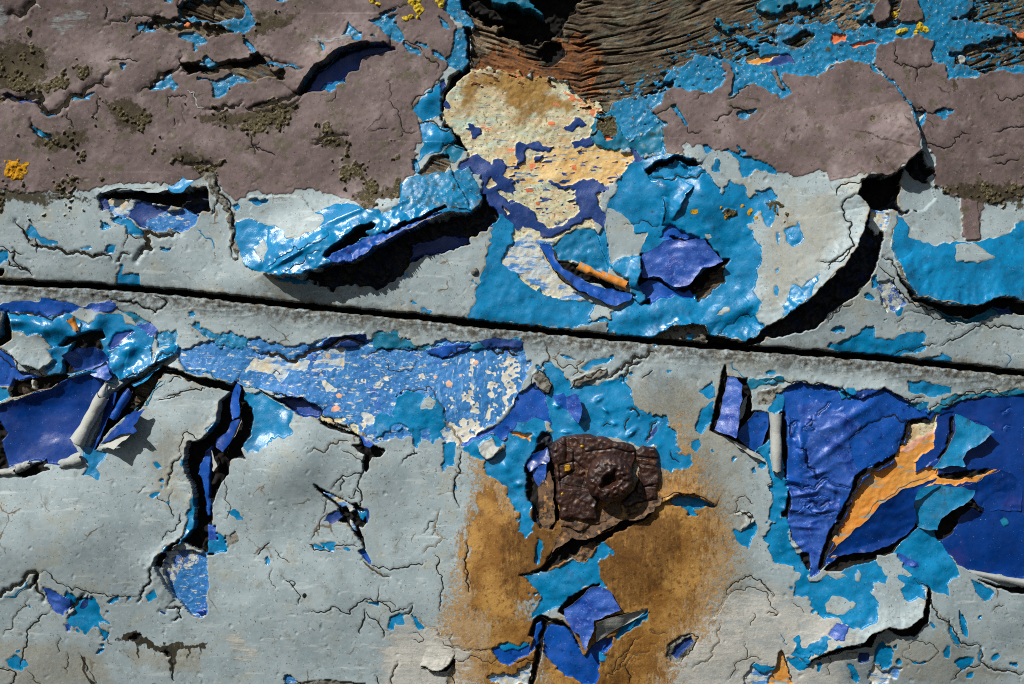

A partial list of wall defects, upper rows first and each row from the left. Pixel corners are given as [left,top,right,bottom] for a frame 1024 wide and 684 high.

peeling [370,0,1024,357]
peeling [914,353,952,363]
peeling [0,613,48,684]
crack [56,638,96,683]
crack [257,542,301,602]
peeling [0,296,693,654]
crack [423,451,471,611]
peeling [311,541,648,684]
corrosion [424,412,750,684]
peeling [695,363,1024,684]